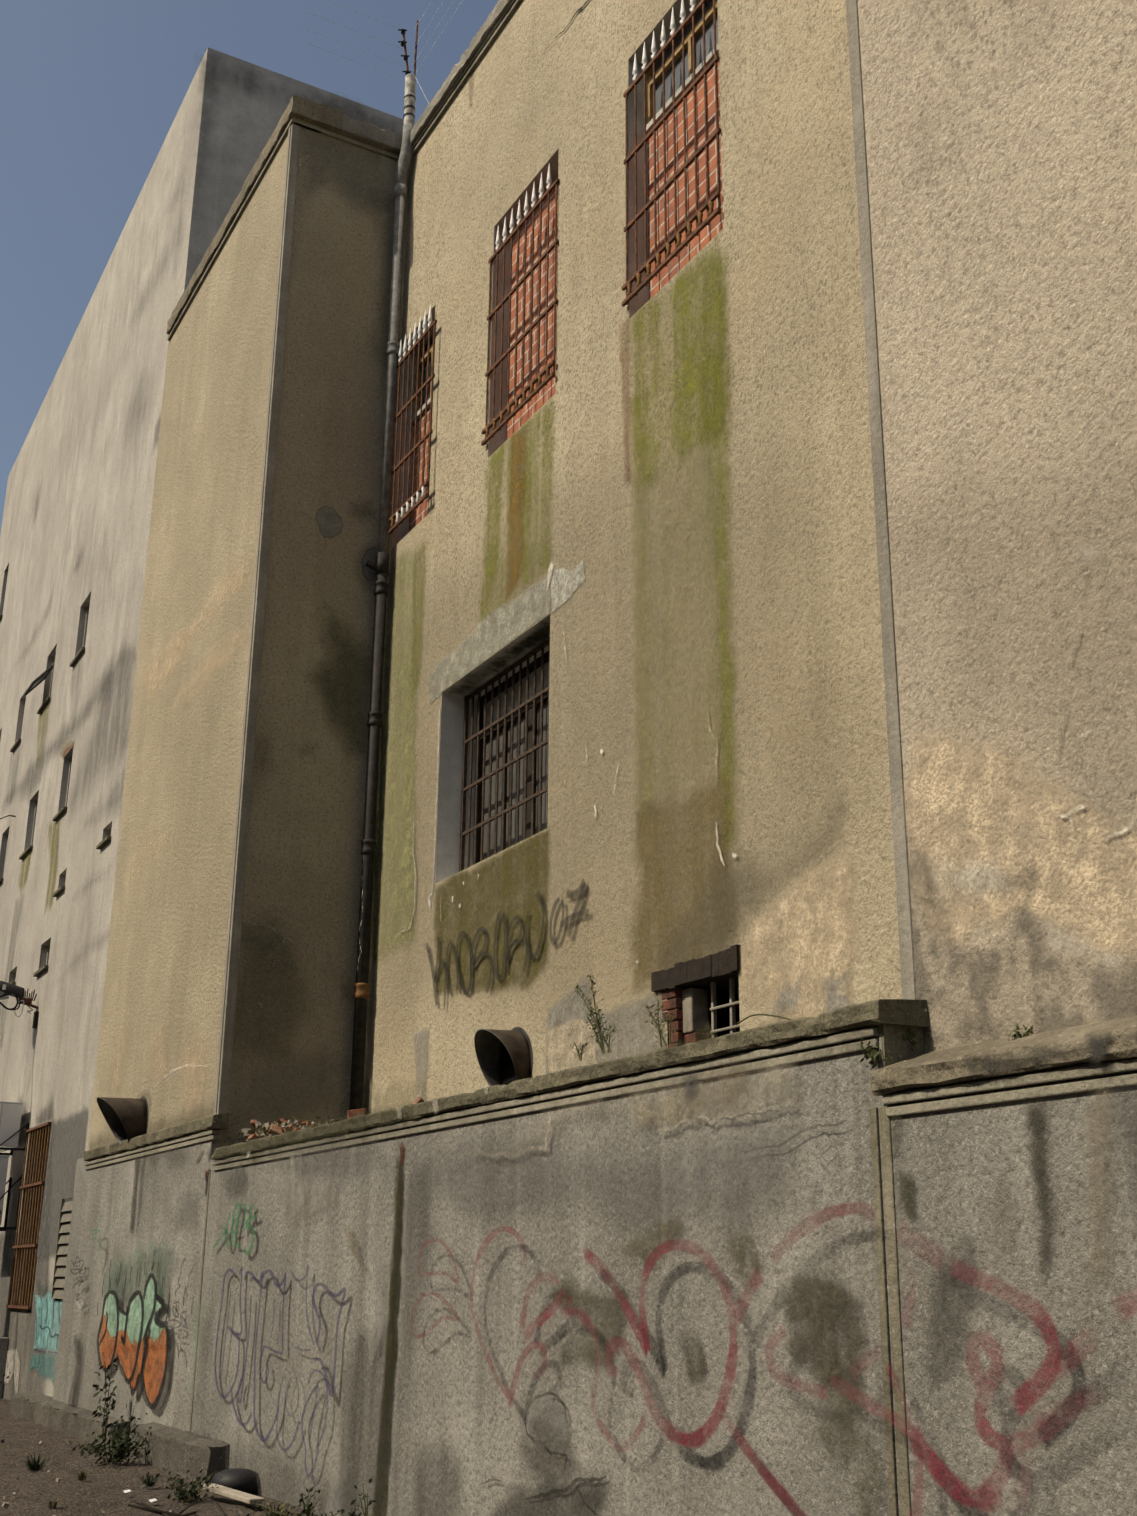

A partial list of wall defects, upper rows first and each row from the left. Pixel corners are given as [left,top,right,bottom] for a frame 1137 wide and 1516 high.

crack [542,0,589,55]
damp [509,434,523,587]
damp [1027,1105,1048,1261]